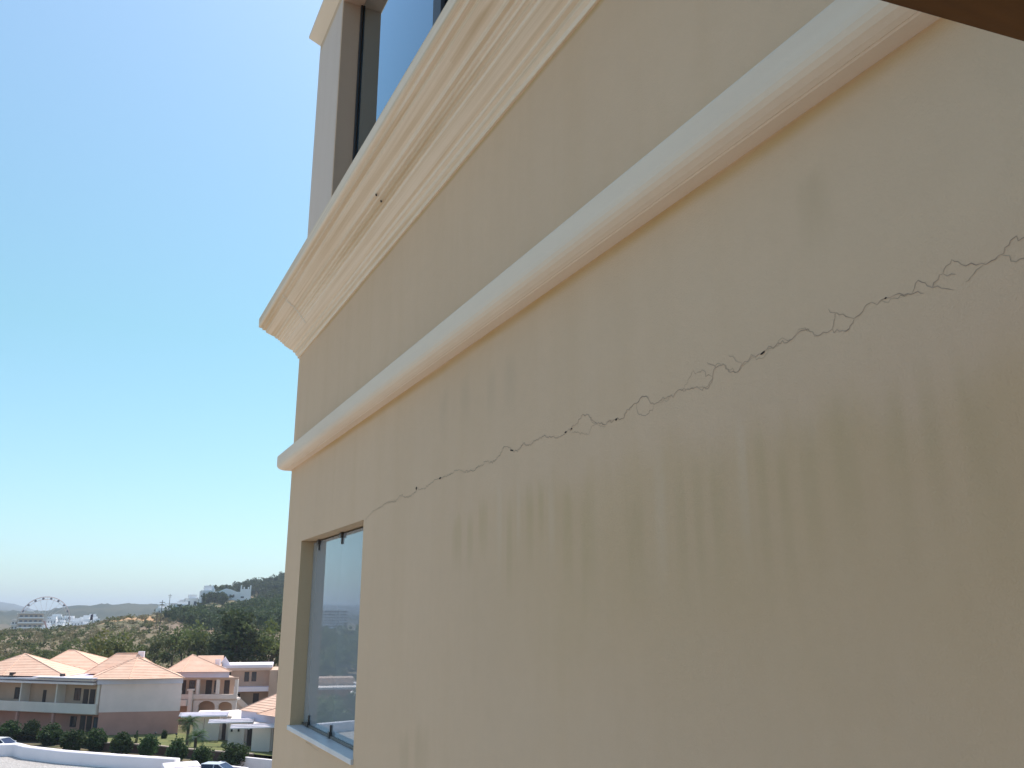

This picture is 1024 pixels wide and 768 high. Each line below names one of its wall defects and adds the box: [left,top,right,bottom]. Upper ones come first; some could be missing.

crack [366,235,1024,519]
damp [430,281,1024,768]